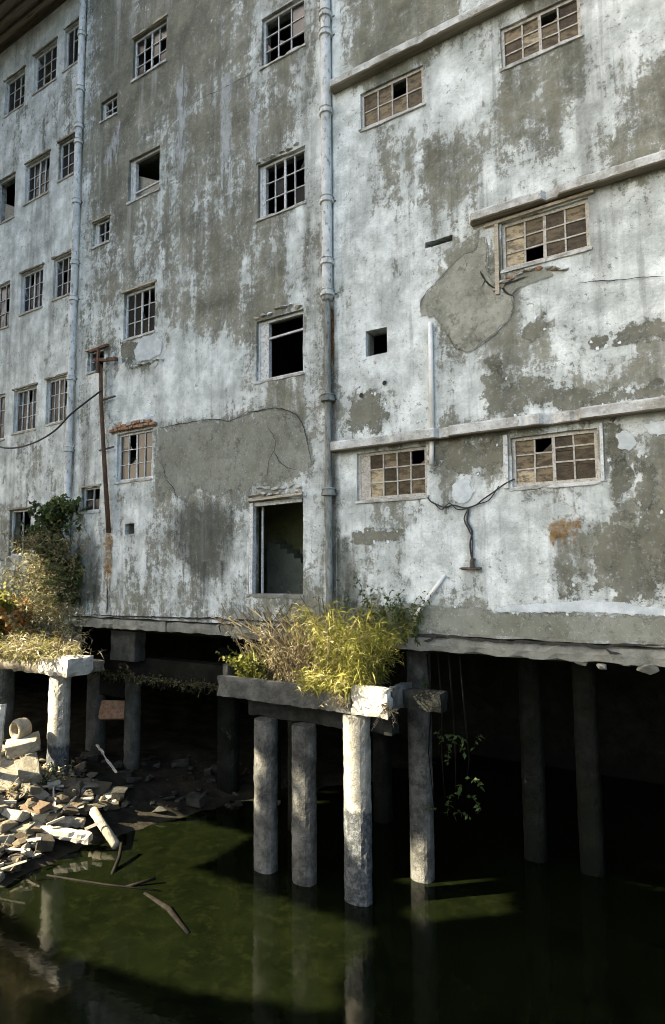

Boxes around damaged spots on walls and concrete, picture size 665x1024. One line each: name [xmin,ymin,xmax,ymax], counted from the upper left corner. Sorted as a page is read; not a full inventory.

damp [104,123,120,176]
damp [173,66,187,172]
damp [221,73,233,190]
damp [249,92,258,161]
crack [582,275,662,283]
peeling [588,318,665,351]
crack [158,407,314,477]
peeling [346,387,390,438]
peeling [479,354,665,418]
rust [103,529,113,589]
peeling [341,418,665,644]
rust [548,519,581,546]